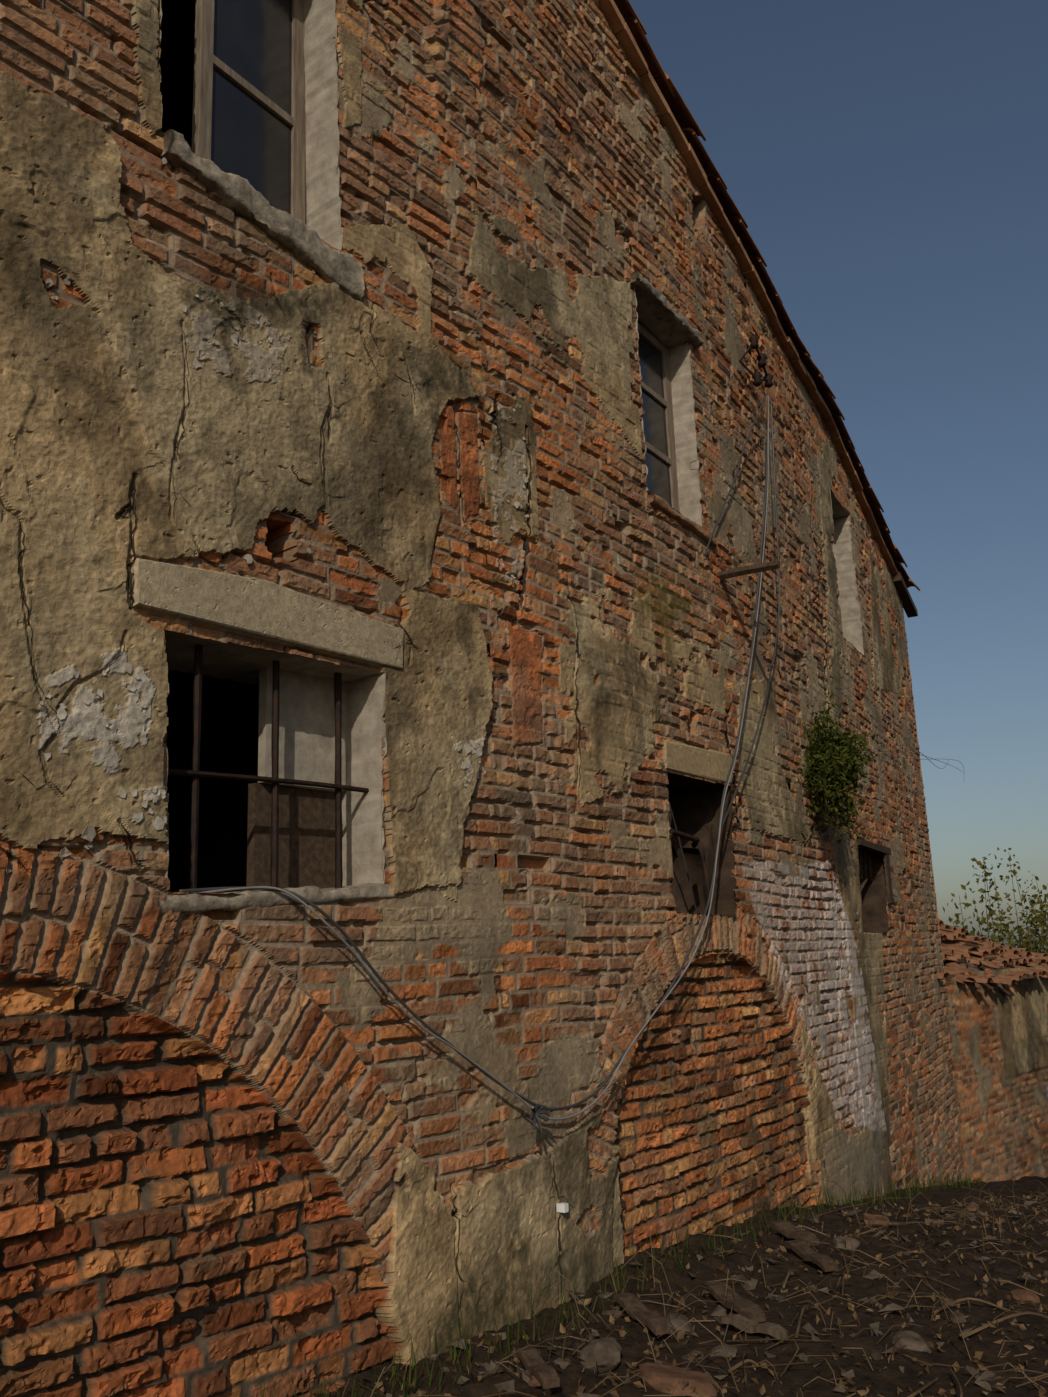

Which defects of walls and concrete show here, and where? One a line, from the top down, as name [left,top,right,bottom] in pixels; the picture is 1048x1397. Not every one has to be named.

spalling [119,136,325,383]
crack [0,327,252,798]
spalling [215,505,411,627]
crack [291,373,345,510]
peeling [484,396,532,590]
peeling [455,737,487,787]